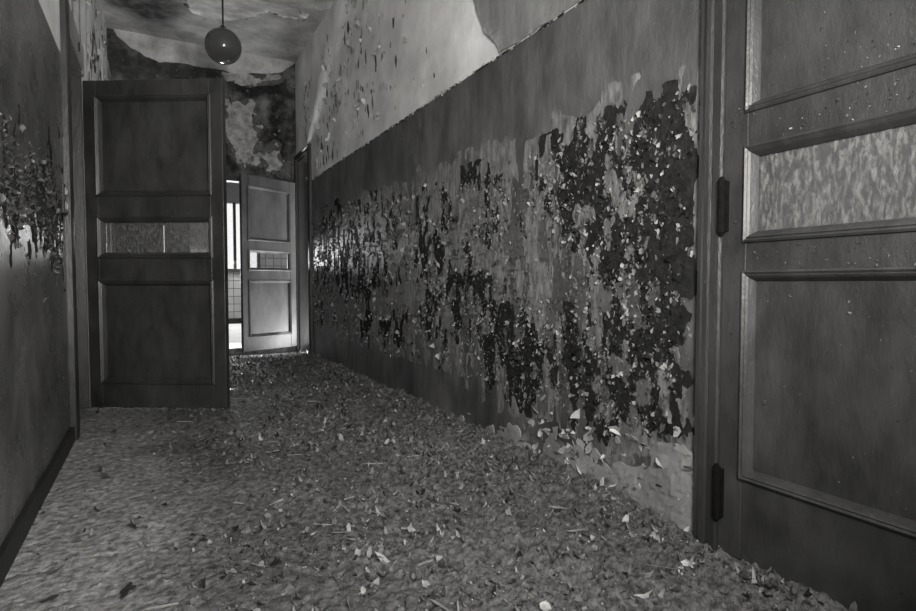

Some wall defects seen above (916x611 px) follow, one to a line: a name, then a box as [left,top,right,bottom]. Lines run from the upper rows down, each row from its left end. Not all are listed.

peeling [0,104,68,292]
peeling [311,65,701,533]